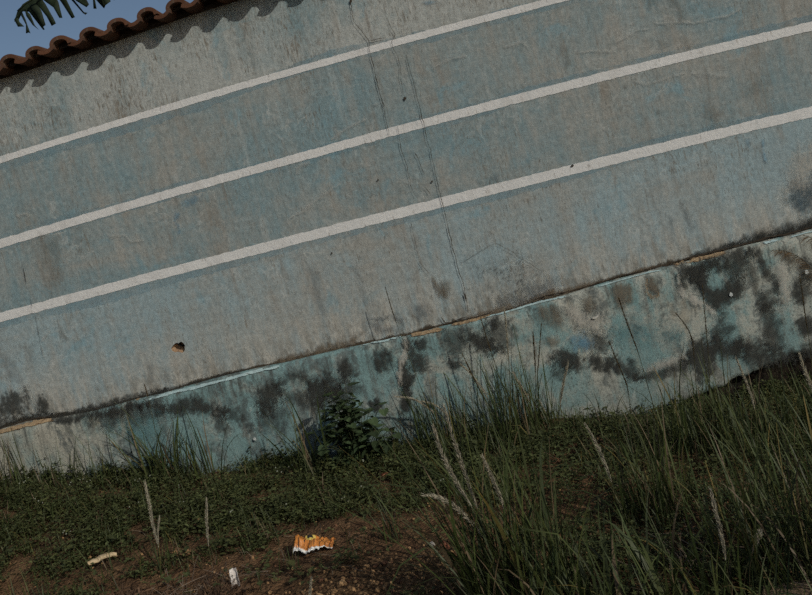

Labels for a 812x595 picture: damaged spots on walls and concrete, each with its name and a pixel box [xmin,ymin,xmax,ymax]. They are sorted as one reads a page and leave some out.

crack [350,0,539,335]
water stain [0,387,252,428]
spalling [171,342,185,353]
water stain [256,358,361,417]
water stain [371,335,428,413]
water stain [442,314,517,369]
water stain [546,245,812,384]